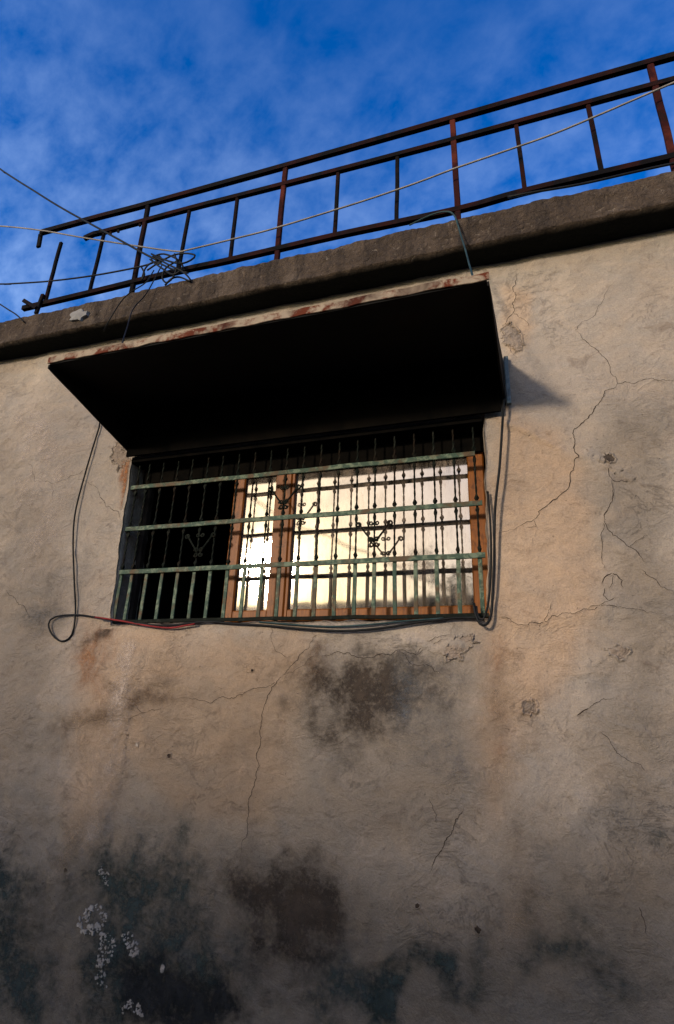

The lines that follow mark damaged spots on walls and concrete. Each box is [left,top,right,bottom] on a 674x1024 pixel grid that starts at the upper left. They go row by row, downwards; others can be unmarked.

spalling [499,320,526,354]
crack [499,273,674,533]
spalling [598,451,618,464]
crack [499,468,674,627]
crack [64,629,451,861]
water stain [0,859,51,1024]
water stain [78,846,240,1024]
water stain [316,943,480,1024]